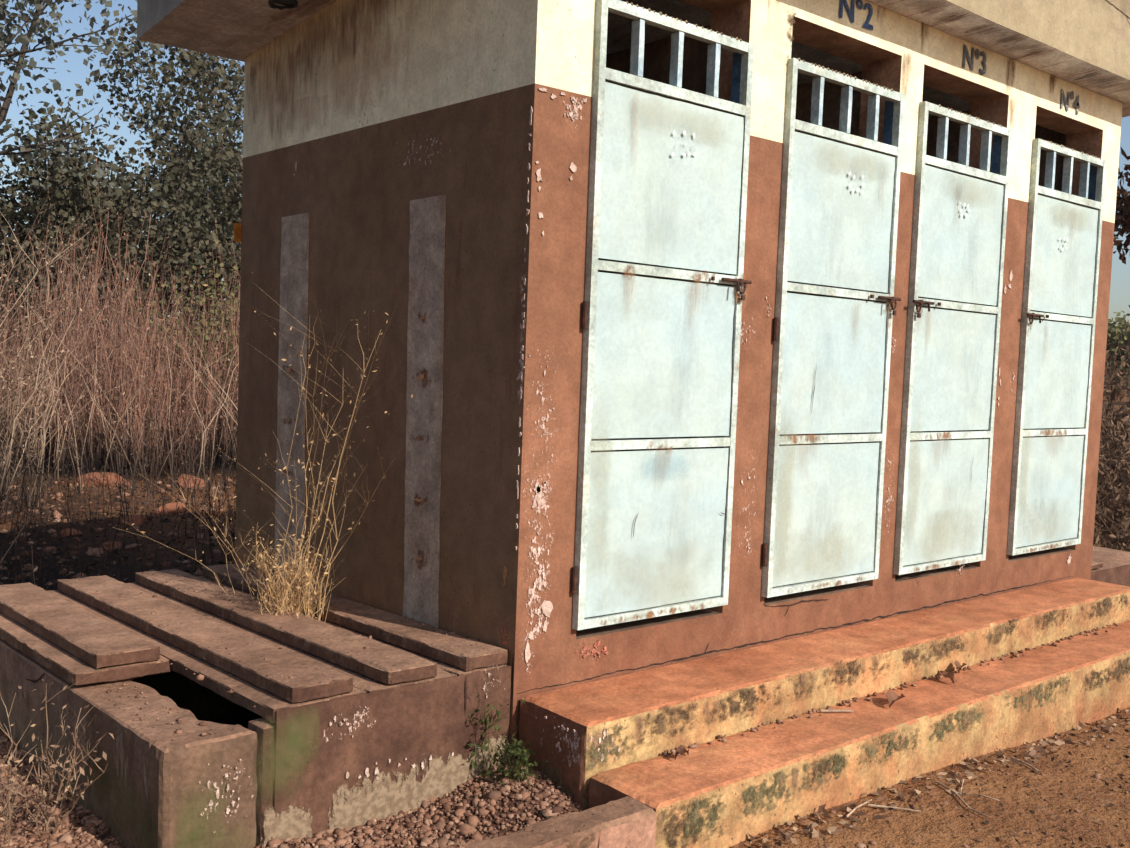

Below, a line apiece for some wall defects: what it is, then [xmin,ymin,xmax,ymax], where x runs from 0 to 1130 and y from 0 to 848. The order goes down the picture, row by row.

peeling [538,88,587,128]
spalling [524,106,544,261]
peeling [515,275,557,673]
damp [796,654,890,699]
damp [904,635,967,667]
damp [1008,677,1070,711]
damp [1086,657,1130,691]
peeling [323,706,376,742]
damp [586,684,780,769]
damp [743,704,983,815]
peeling [199,759,255,823]
damp [659,798,726,848]